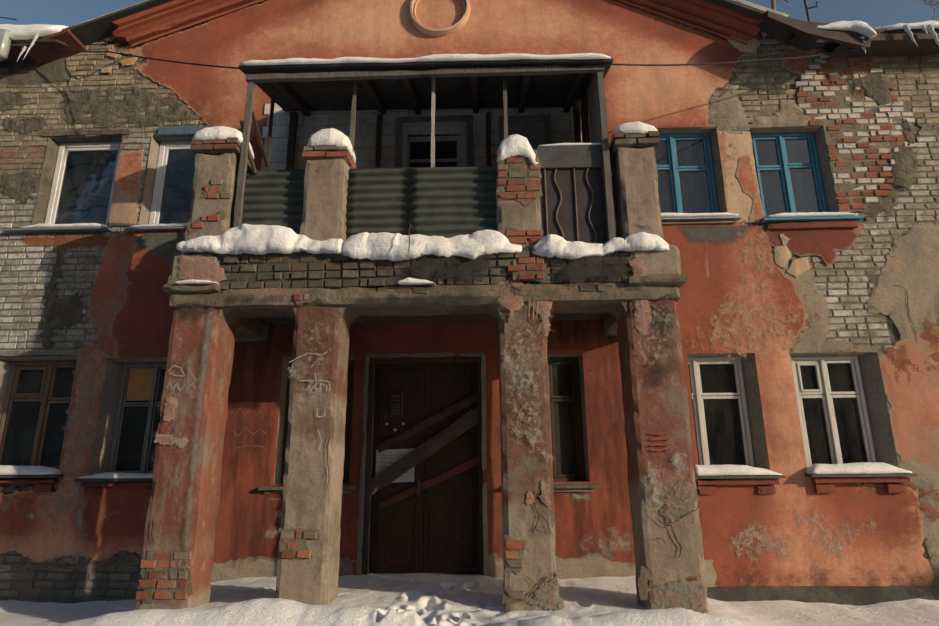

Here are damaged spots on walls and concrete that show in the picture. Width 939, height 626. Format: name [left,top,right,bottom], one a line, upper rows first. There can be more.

flaking render [0,35,208,357]
flaking render [496,151,543,206]
flaking render [505,227,544,244]
flaking render [696,32,939,383]
crack [895,285,917,341]
flaking render [497,257,553,460]
peeling [154,397,189,448]
flaking render [279,528,321,560]
crack [529,491,550,539]
crack [656,501,701,558]
flaking render [0,548,193,604]